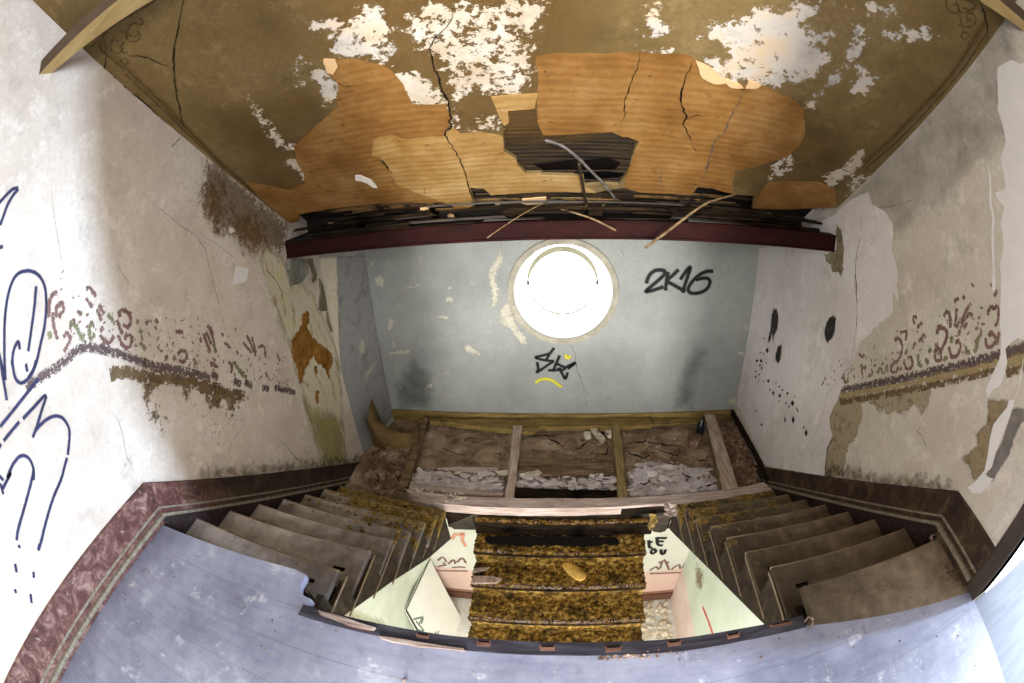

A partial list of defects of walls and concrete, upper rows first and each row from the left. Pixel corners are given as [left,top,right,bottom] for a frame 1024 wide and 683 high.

crack [103,0,184,146]
peeling [247,94,304,181]
peeling [292,55,338,107]
peeling [306,0,550,133]
crack [429,4,474,200]
crack [620,54,640,124]
peeling [635,1,674,54]
crack [680,63,742,181]
peeling [696,0,939,110]
leakage [198,160,346,466]
peeling [825,388,931,476]
peeling [964,400,1024,480]